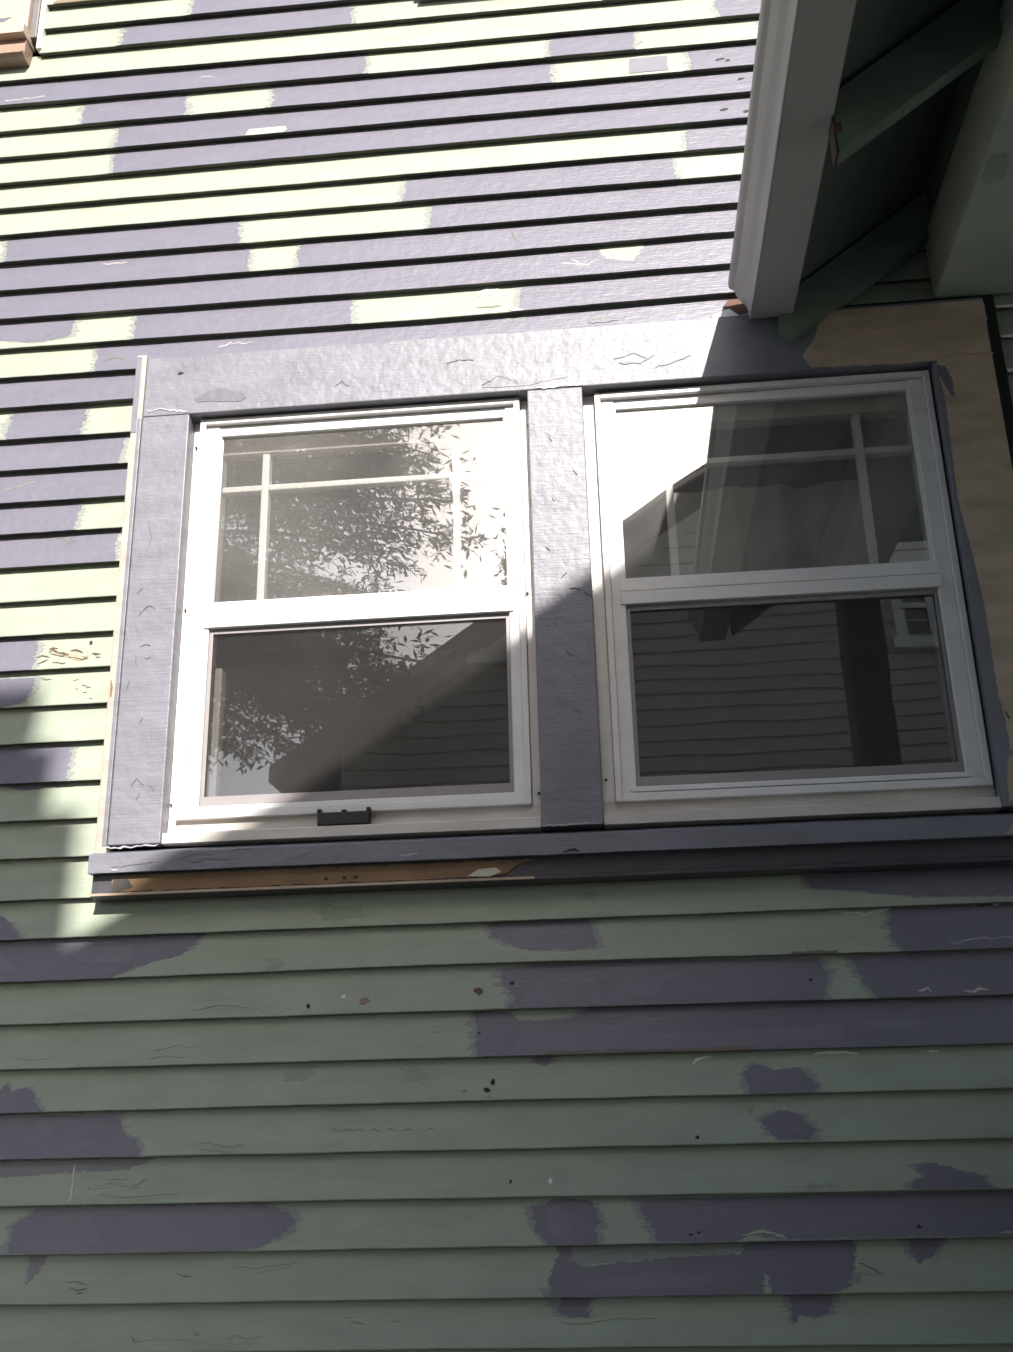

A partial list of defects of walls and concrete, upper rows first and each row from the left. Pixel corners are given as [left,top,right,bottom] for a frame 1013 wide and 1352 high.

peeling [110,853,535,893]